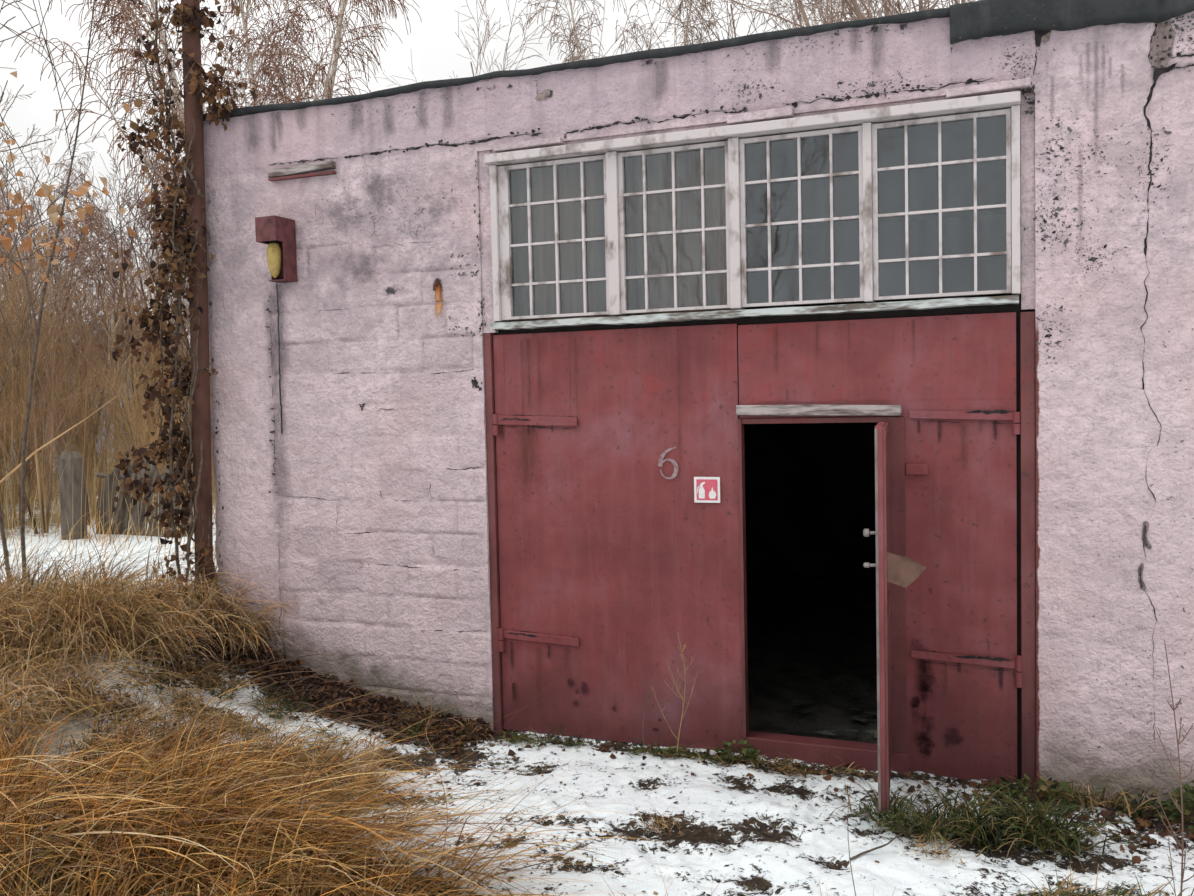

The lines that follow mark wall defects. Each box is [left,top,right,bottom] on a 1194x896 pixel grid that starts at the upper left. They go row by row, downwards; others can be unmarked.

crack [786,78,994,107]
crack [270,106,747,166]
corrosion [433,278,443,315]
crack [1137,52,1194,777]